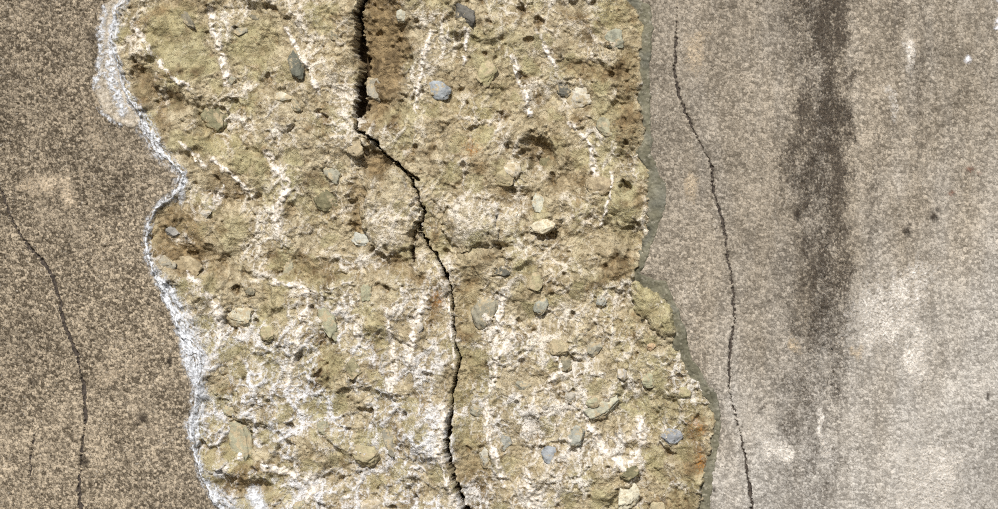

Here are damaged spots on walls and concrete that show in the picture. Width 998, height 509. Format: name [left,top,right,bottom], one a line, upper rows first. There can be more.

crack [0,188,88,509]
leakage [108,0,235,509]
leakage [178,141,254,209]
leakage [262,151,291,239]
crack [354,0,420,182]
spalling [93,0,721,509]
leakage [384,293,430,397]
crack [411,206,471,509]
leakage [483,290,513,488]
leakage [582,405,644,472]
crack [673,7,754,509]
leakage [779,0,929,390]